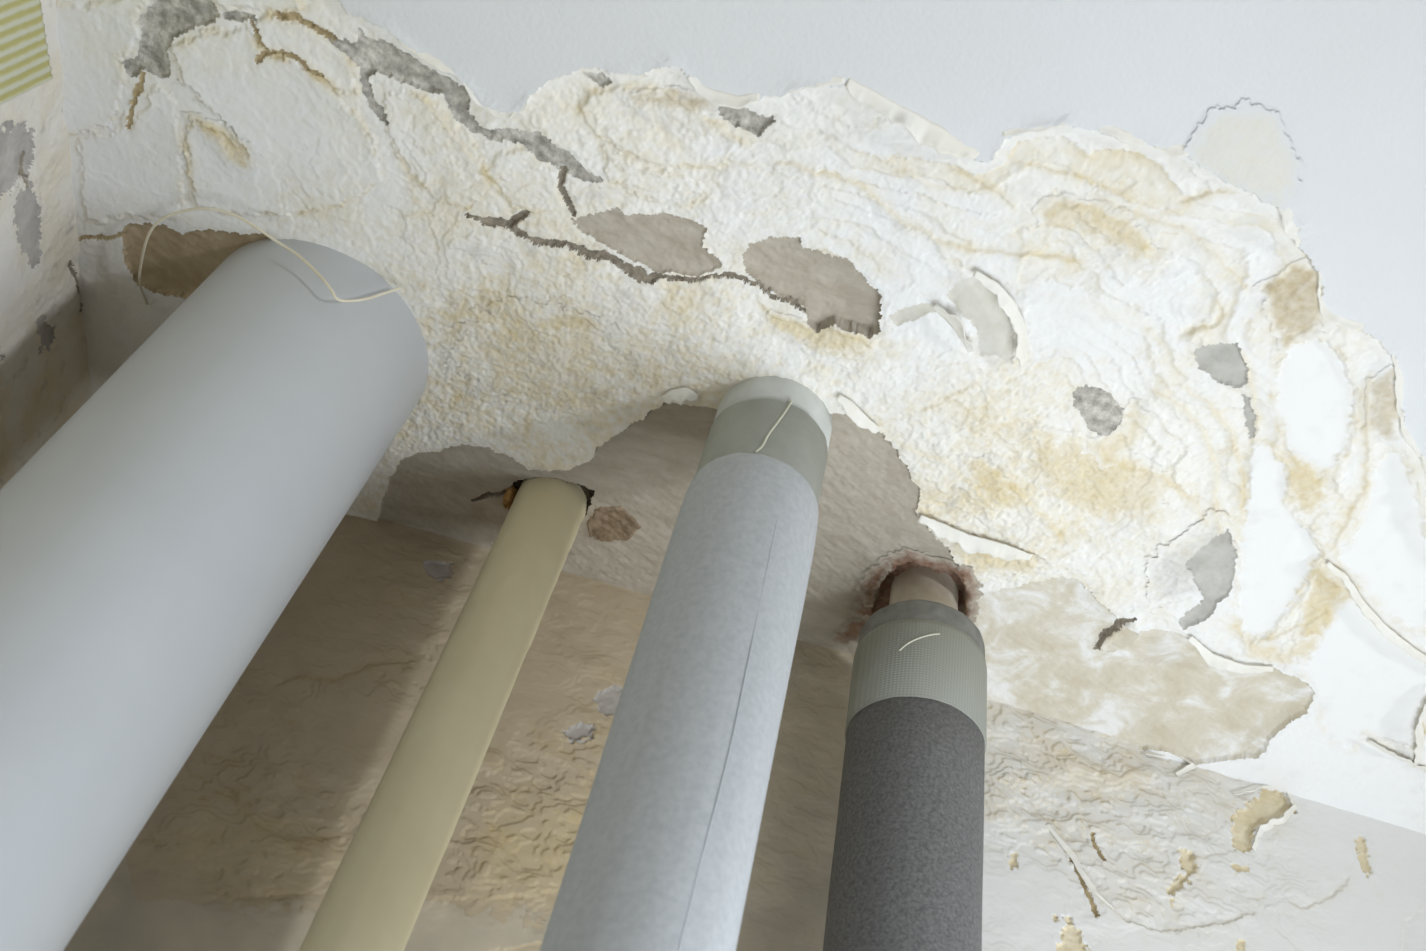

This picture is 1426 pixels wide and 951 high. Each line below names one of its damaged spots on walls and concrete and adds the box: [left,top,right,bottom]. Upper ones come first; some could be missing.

crack [248,10,339,78]
crack [125,71,146,129]
spalling [328,28,604,183]
spalling [718,106,776,137]
crack [465,165,806,313]
spalling [1072,384,1125,436]
rust [830,547,984,646]
peeling [918,515,1032,561]
spalling [1178,529,1238,630]
peeling [125,514,490,904]
peeling [425,570,652,908]
peeling [1006,705,1297,934]